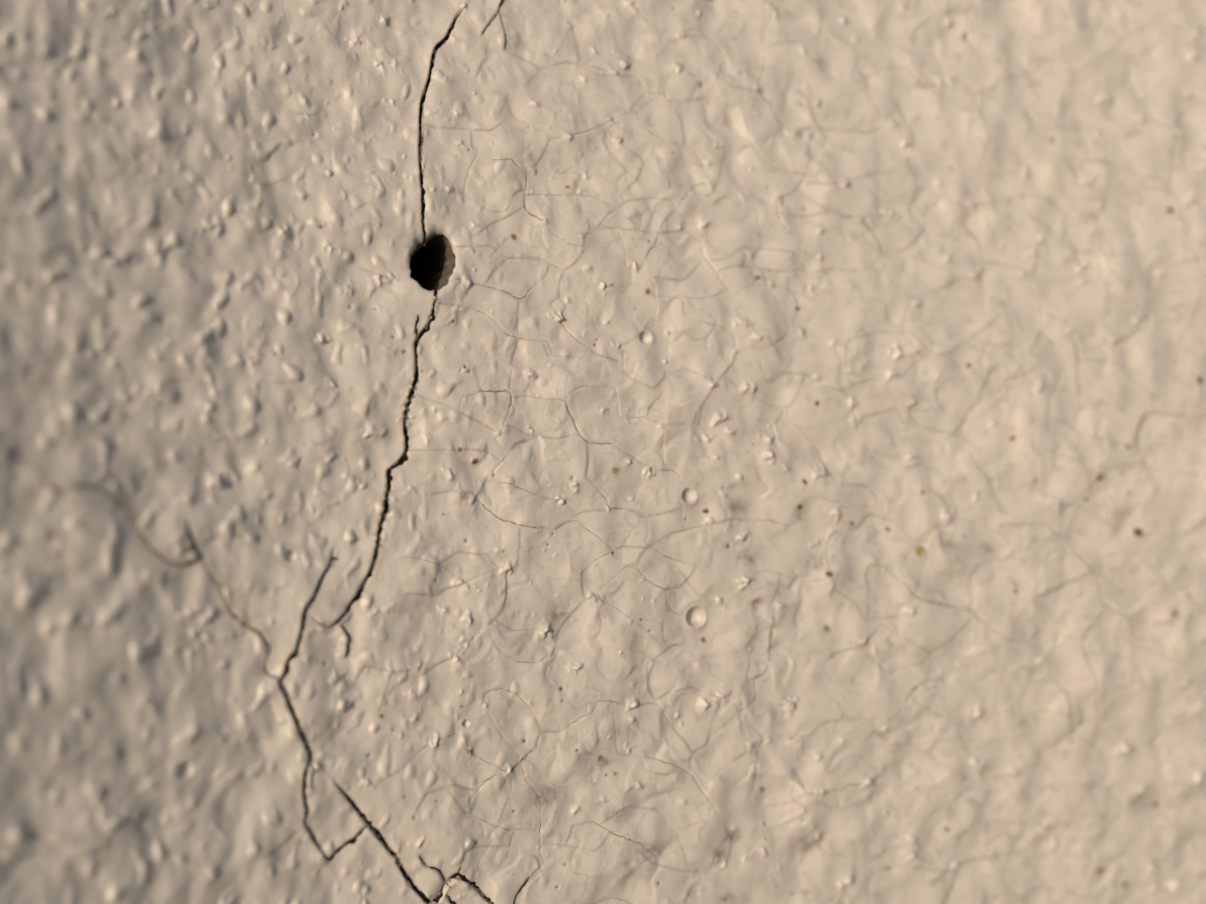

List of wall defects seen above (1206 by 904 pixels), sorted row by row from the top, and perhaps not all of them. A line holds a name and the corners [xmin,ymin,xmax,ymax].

crack [419,0,507,248]
crack [467,76,808,657]
crack [0,284,621,904]
crack [655,608,775,732]
crack [828,561,1020,660]
crack [1028,524,1134,721]
crack [580,821,657,857]
crack [634,731,723,824]